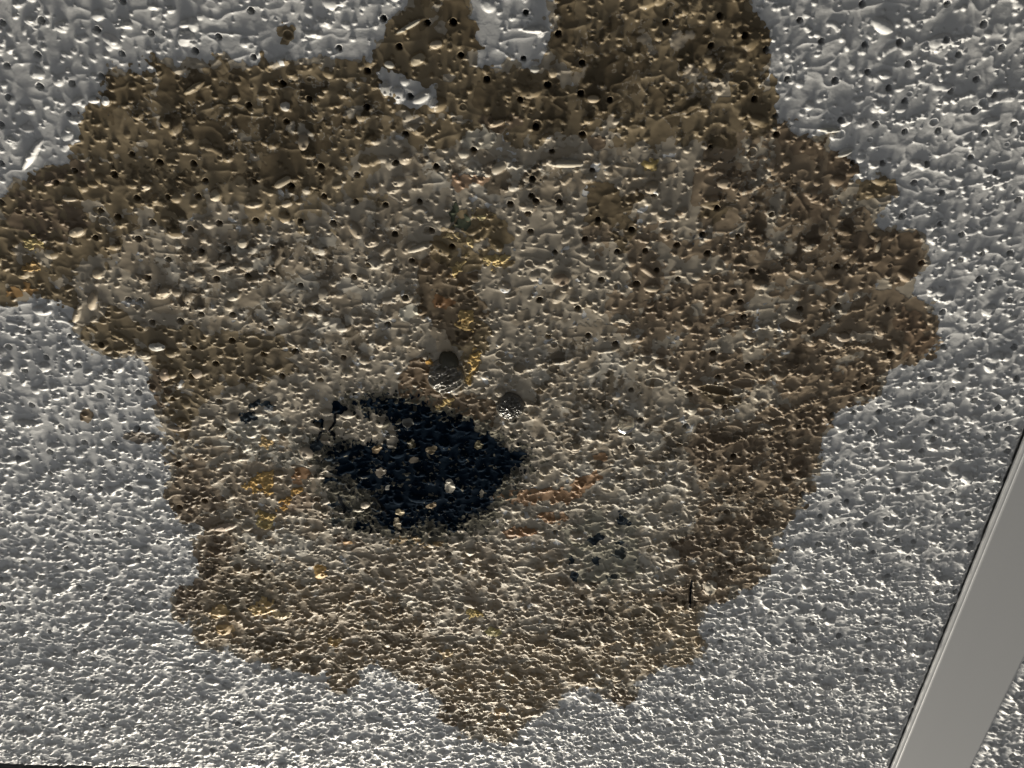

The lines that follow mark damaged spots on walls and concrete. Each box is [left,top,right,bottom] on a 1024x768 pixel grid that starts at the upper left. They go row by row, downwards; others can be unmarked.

leakage [276,22,296,45]
leakage [80,409,94,423]
leakage [123,427,159,445]
mould [379,489,413,516]